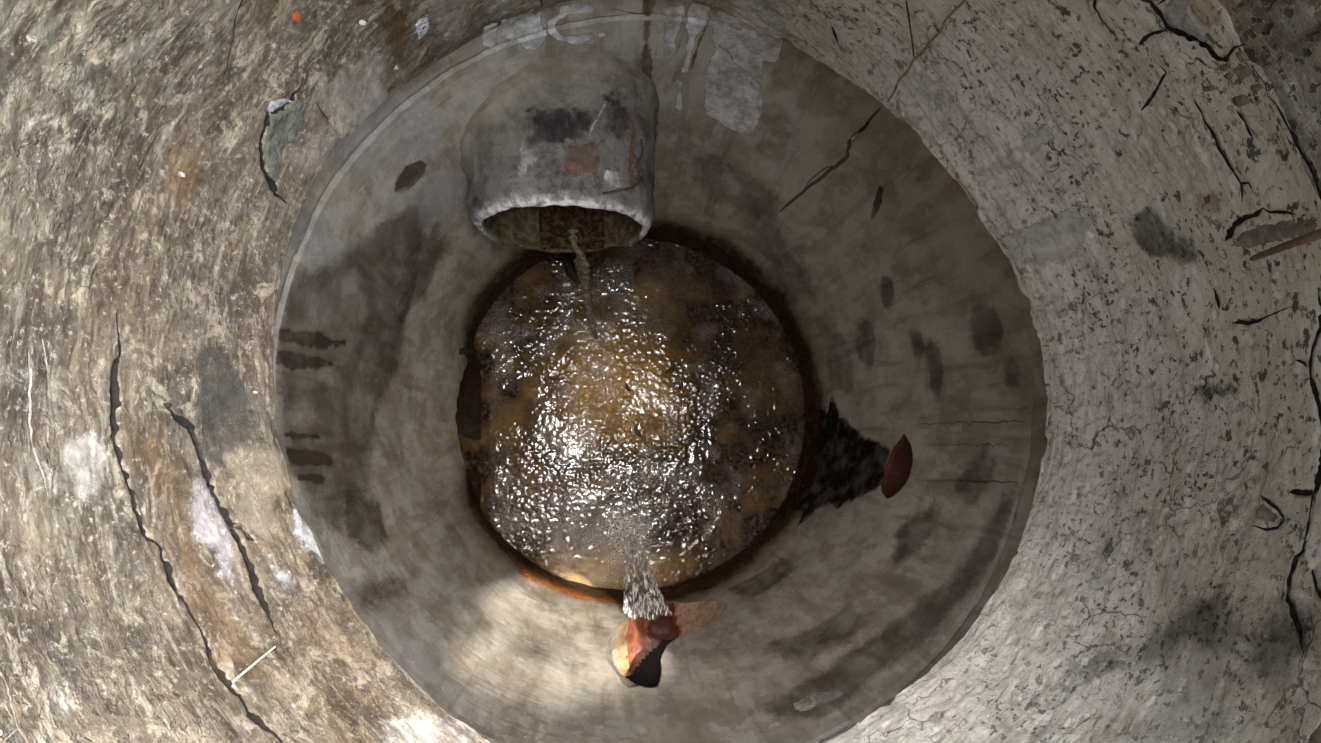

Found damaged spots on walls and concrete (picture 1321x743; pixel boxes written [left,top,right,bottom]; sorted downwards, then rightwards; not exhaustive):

crack [259,84,340,203]
leakage [518,147,537,177]
leakage [527,95,631,143]
leakage [604,170,619,181]
crack [1093,0,1321,241]
crack [110,308,283,743]
leakage [464,219,890,606]
crack [1212,287,1321,655]
crack [0,672,28,743]
leakage [764,670,857,731]